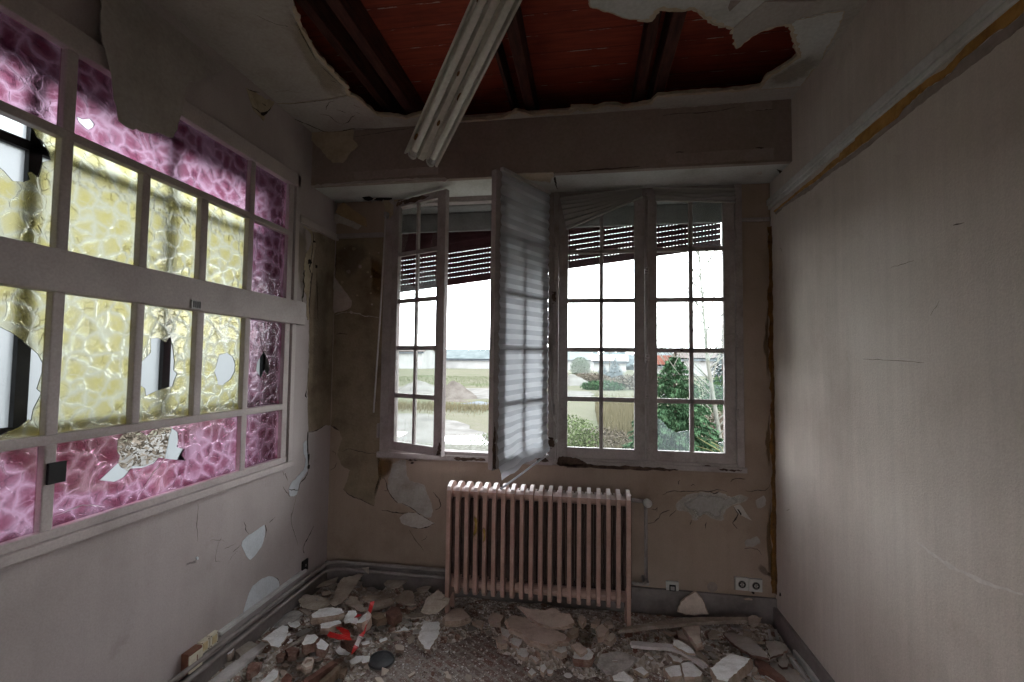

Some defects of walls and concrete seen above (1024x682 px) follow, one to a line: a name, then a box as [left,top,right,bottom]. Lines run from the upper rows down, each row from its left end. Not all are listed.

flaking render [292,6,421,120]
flaking render [461,0,845,122]
flaking render [283,226,441,529]
flaking render [233,517,275,560]
flaking render [243,576,280,613]
flaking render [663,489,766,528]